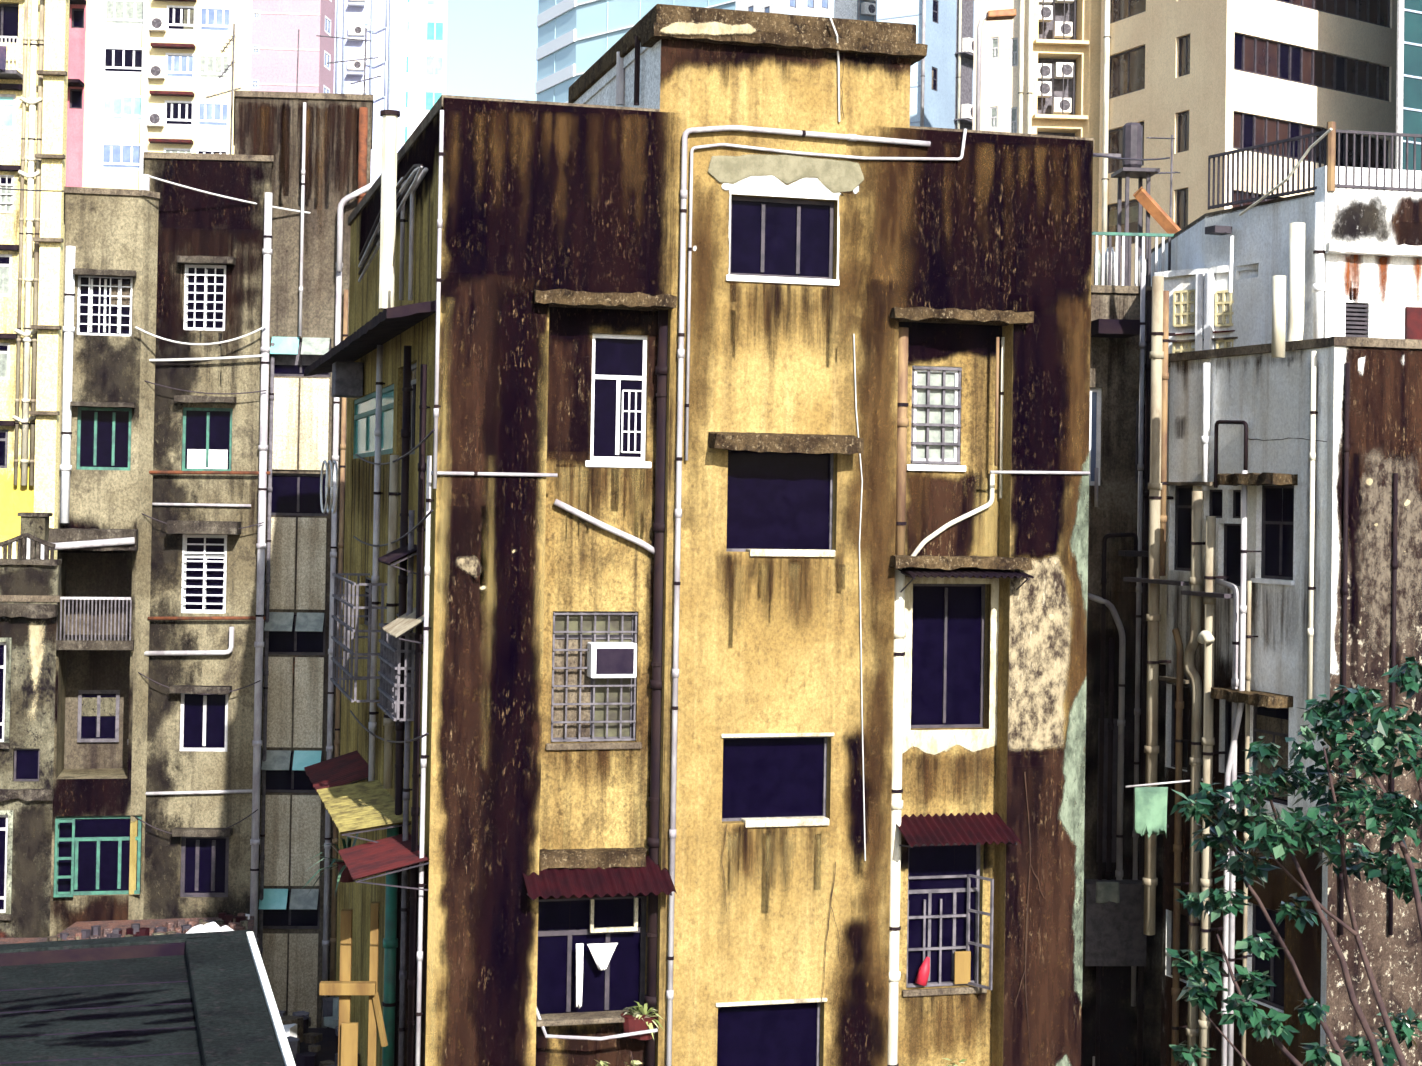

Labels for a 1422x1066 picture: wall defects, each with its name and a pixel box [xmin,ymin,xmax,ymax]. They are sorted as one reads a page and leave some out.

leakage [478,112,571,185]
leakage [590,112,675,215]
leakage [945,146,1078,216]
leakage [1331,196,1422,246]
leakage [689,194,719,404]
rust [1344,254,1390,303]
flaking render [457,556,486,590]
leakage [726,127,994,1066]
leakage [398,274,674,1066]
leakage [1003,294,1143,1066]